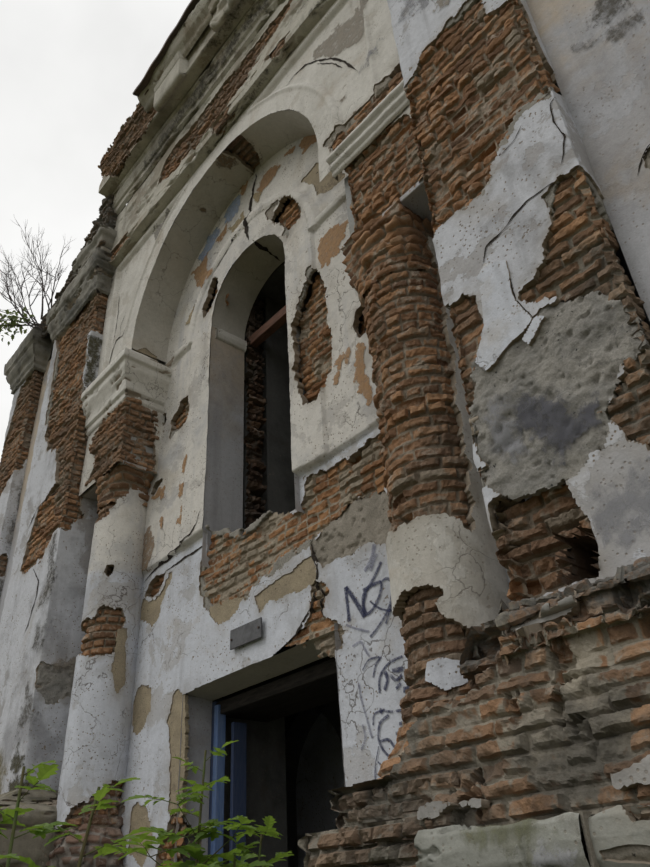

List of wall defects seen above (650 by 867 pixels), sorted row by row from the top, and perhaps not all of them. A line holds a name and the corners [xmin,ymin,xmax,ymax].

damp [403,0,449,19]
damp [592,0,642,41]
crack [280,57,356,89]
spalling [98,102,157,178]
crack [483,97,572,263]
crack [217,175,280,267]
flaking render [162,0,650,658]
spalling [0,293,159,573]
spalling [0,554,8,577]
spalling [141,572,172,627]
spalling [400,587,470,694]
spalling [601,844,650,862]